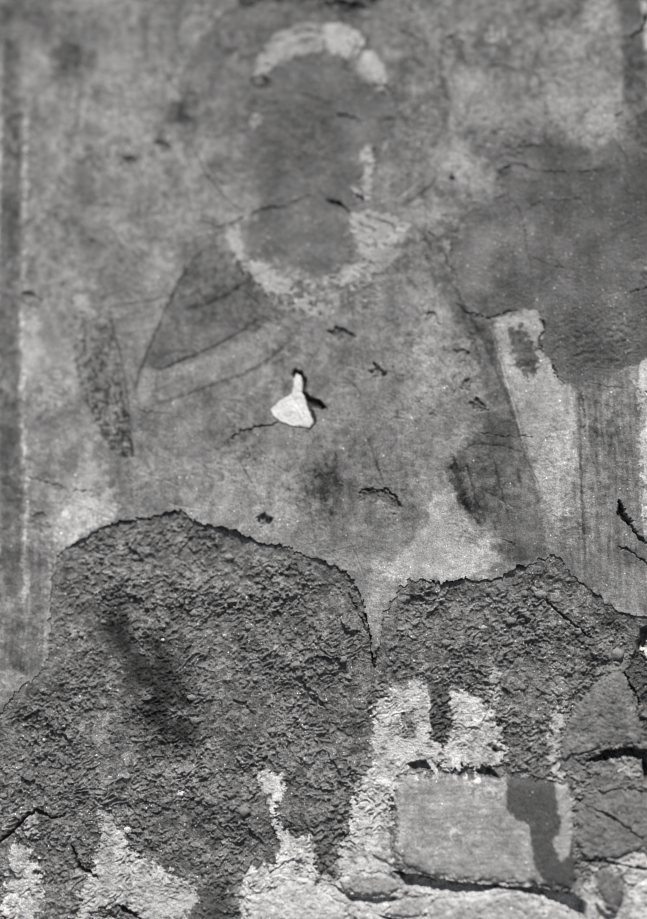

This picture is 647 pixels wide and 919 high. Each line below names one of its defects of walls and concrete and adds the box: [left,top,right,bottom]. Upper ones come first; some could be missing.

peeling [233,0,391,93]
peeling [440,31,466,56]
crack [369,0,564,146]
crack [197,192,364,246]
crack [417,146,631,435]
spalling [270,368,328,431]
crack [224,421,282,446]
peeling [356,486,404,518]
crack [617,499,647,566]
flaking render [0,505,647,919]
crack [0,807,67,845]
crack [69,842,101,882]